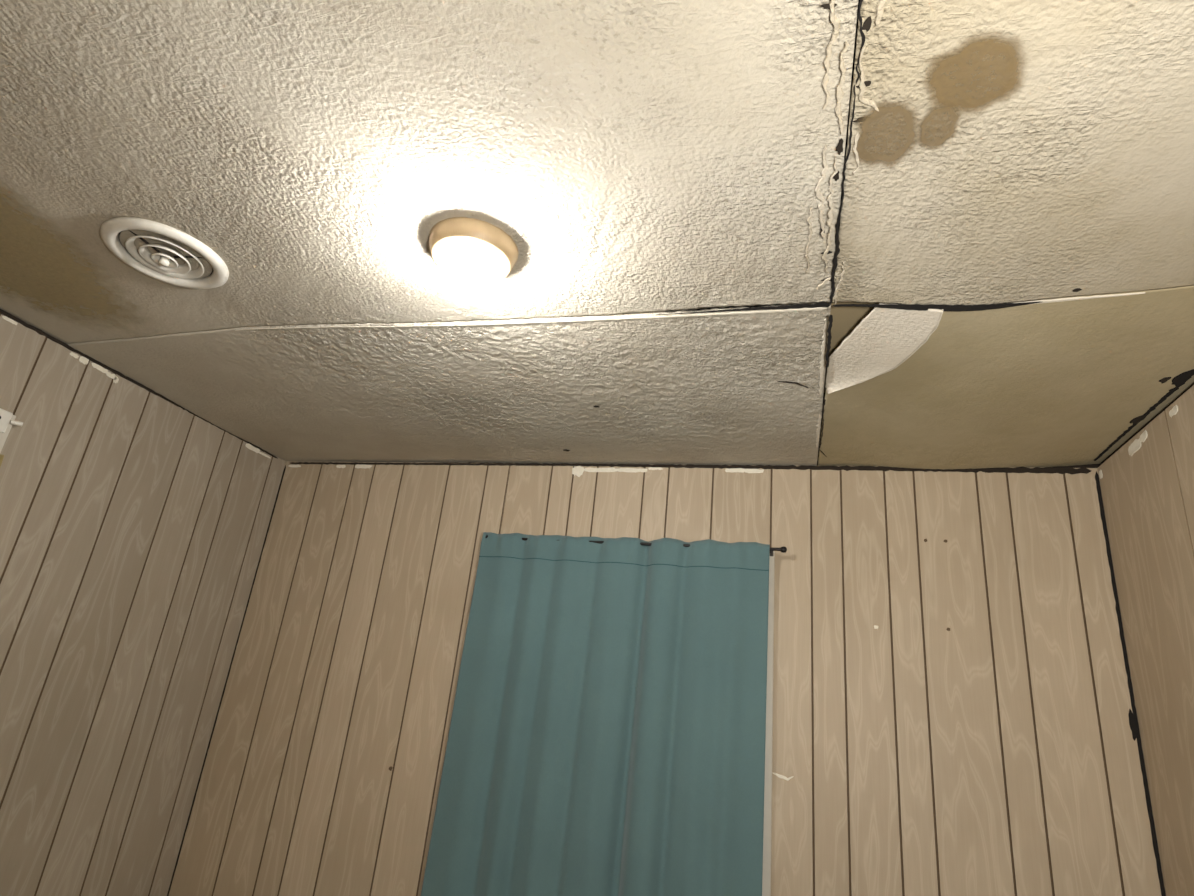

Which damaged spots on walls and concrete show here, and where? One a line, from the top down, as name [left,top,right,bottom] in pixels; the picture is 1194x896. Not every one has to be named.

water stain [856,37,1020,165]
peeling [825,303,943,394]